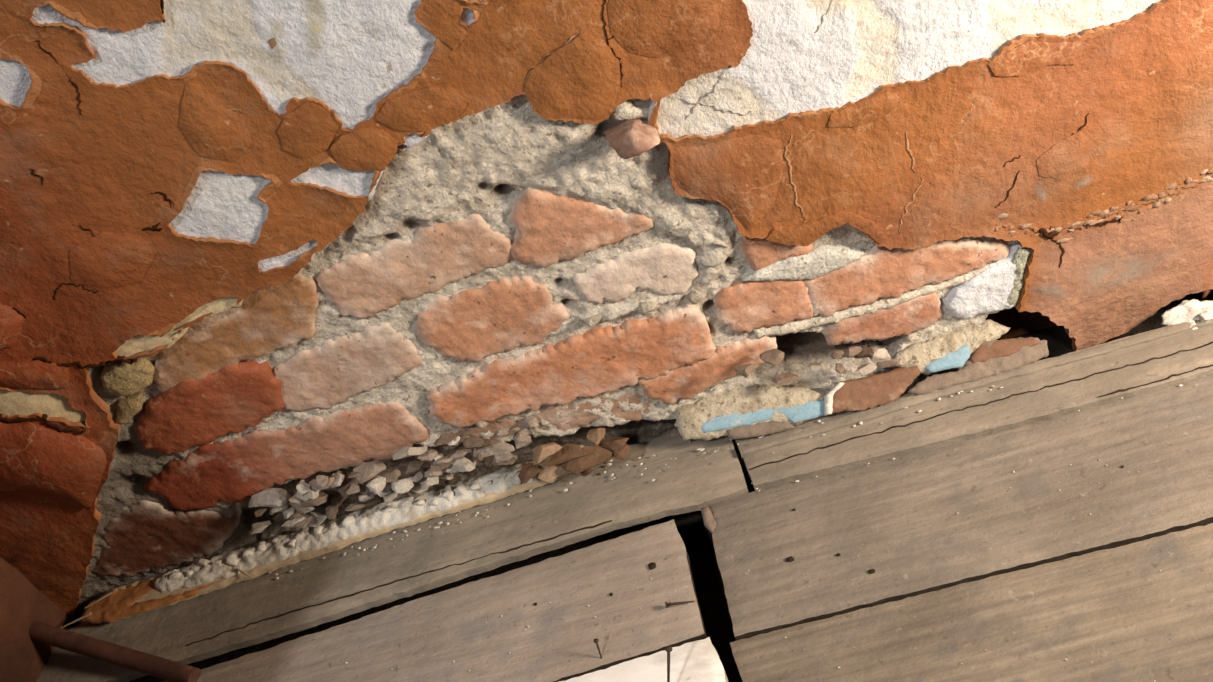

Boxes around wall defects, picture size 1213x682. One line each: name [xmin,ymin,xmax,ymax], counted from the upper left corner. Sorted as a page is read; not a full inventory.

peeling [0,59,42,110]
peeling [29,0,493,129]
crack [525,0,623,87]
peeling [648,0,1163,144]
crack [53,283,98,300]
crack [34,355,138,369]
flaking render [76,94,1031,616]
crack [0,414,86,435]
peeling [0,386,90,429]